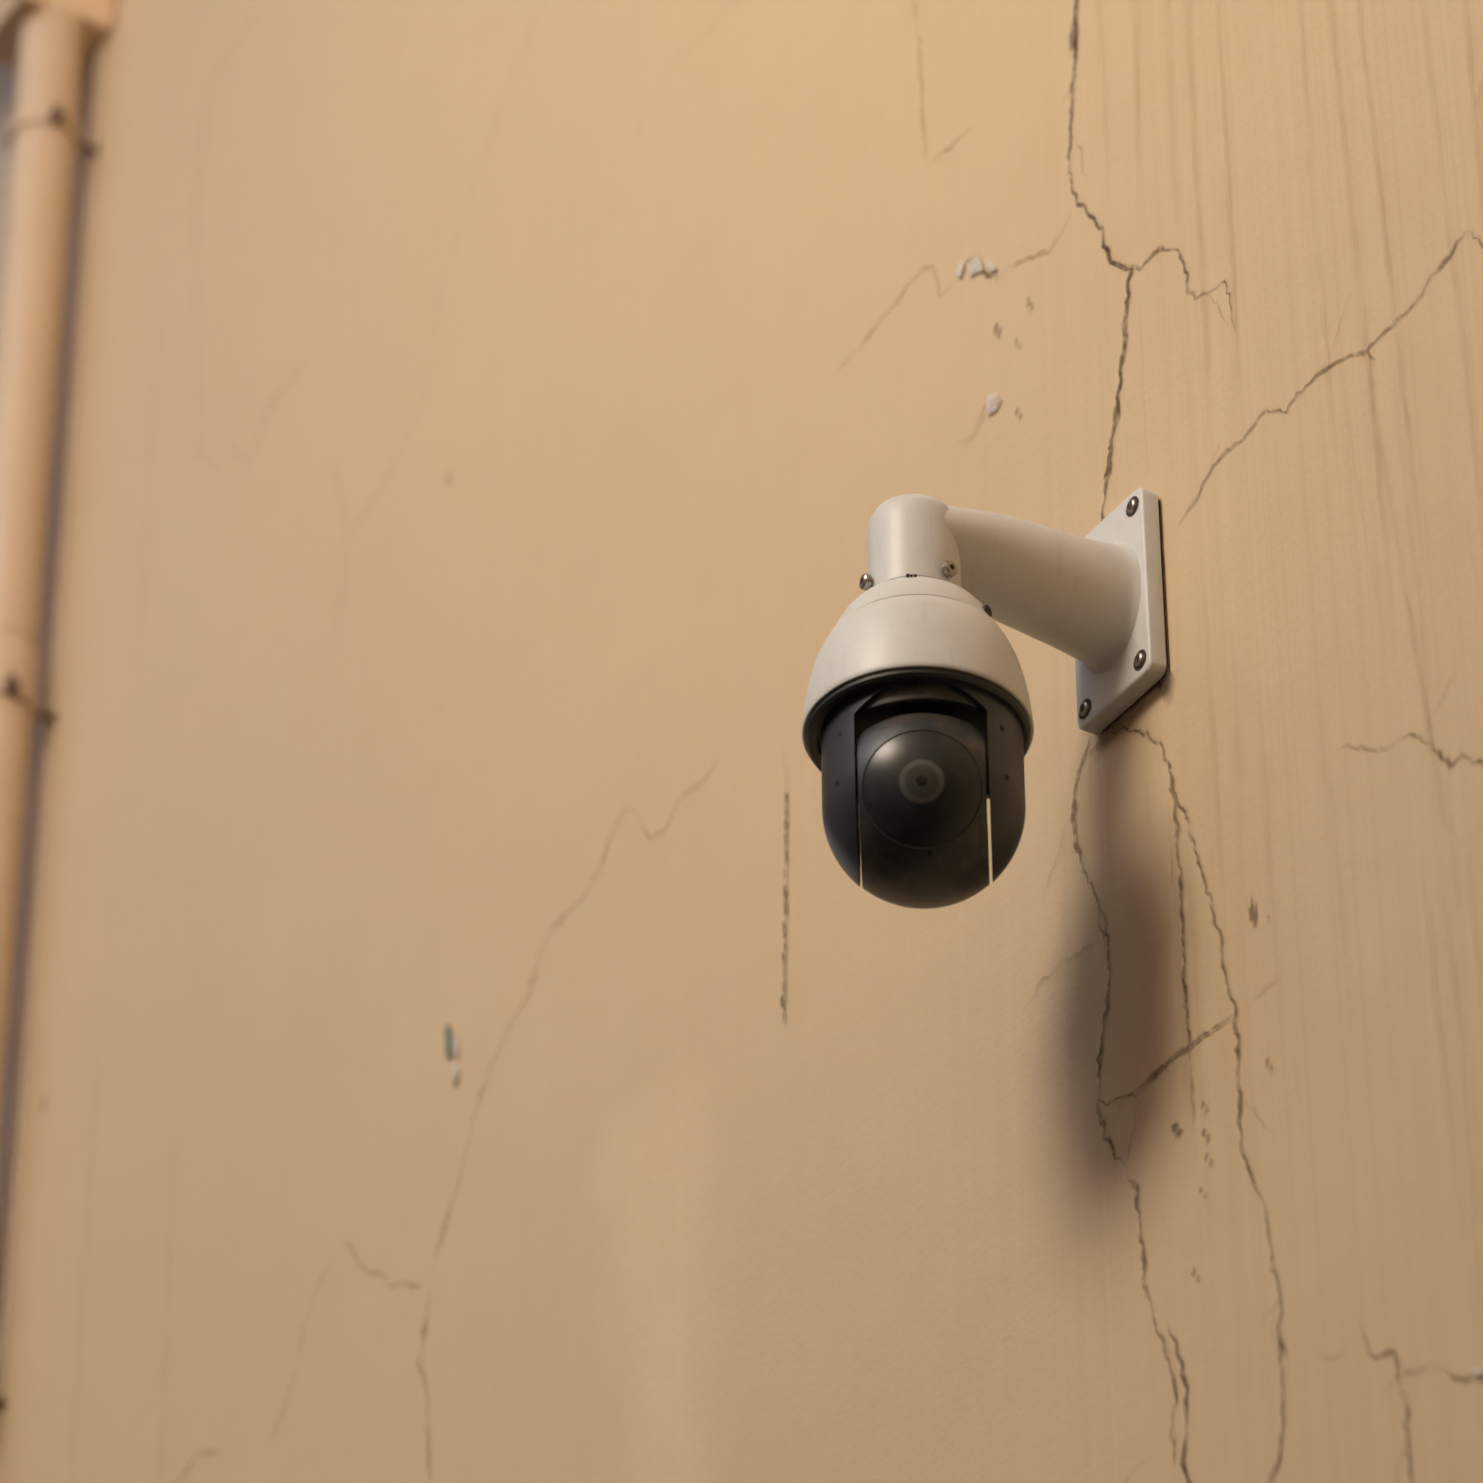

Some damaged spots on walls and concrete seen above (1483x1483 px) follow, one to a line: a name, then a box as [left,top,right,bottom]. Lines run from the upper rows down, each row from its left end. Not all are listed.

crack [1070,0,1078,68]
peeling [955,255,996,277]
crack [1442,232,1480,264]
crack [1067,106,1188,517]
crack [1253,338,1378,426]
crack [1402,733,1481,766]
crack [1071,726,1262,1198]
peeling [444,1023,459,1086]
crack [1108,1139,1146,1289]
crack [1166,1321,1188,1408]
crack [1372,1350,1483,1476]
crack [1173,1444,1191,1483]